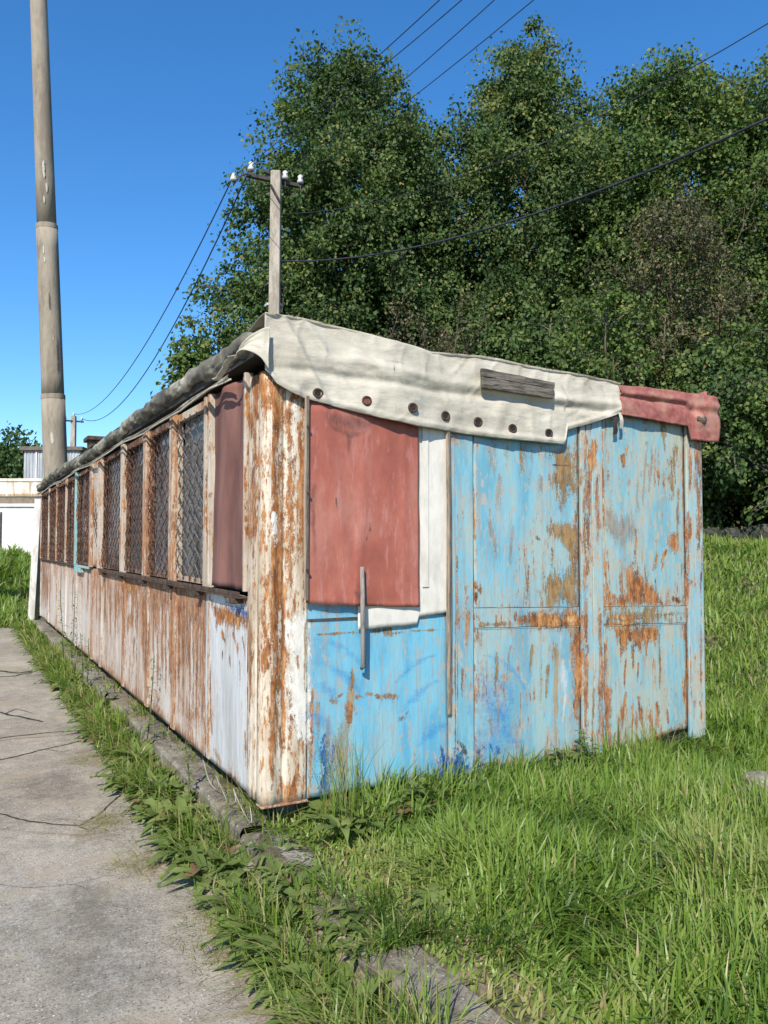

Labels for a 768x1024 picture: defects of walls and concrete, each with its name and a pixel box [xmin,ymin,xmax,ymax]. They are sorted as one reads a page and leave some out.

peeling [604,422,680,544]
rust [40,559,74,612]
rust [86,382,357,803]
rust [372,627,443,637]
rust [454,436,703,747]